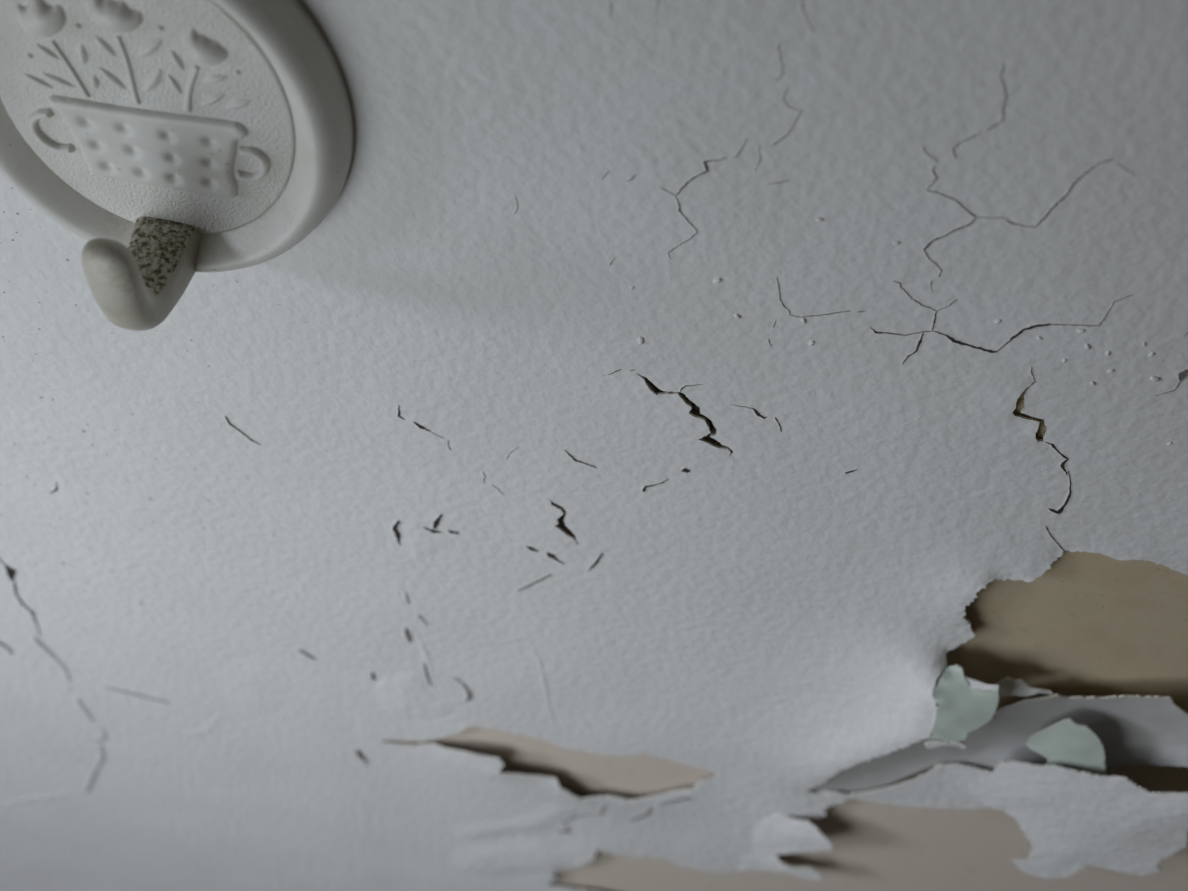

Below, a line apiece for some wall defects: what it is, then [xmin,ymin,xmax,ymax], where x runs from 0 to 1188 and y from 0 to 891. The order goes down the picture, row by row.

crack [600,42,803,259]
crack [767,63,1136,365]
crack [395,405,452,451]
crack [640,465,691,492]
crack [603,368,783,451]
crack [1014,366,1074,551]
crack [1154,367,1188,397]
crack [389,513,460,546]
crack [516,509,605,592]
crack [0,557,170,793]
peeling [442,726,714,791]
peeling [554,551,1188,891]